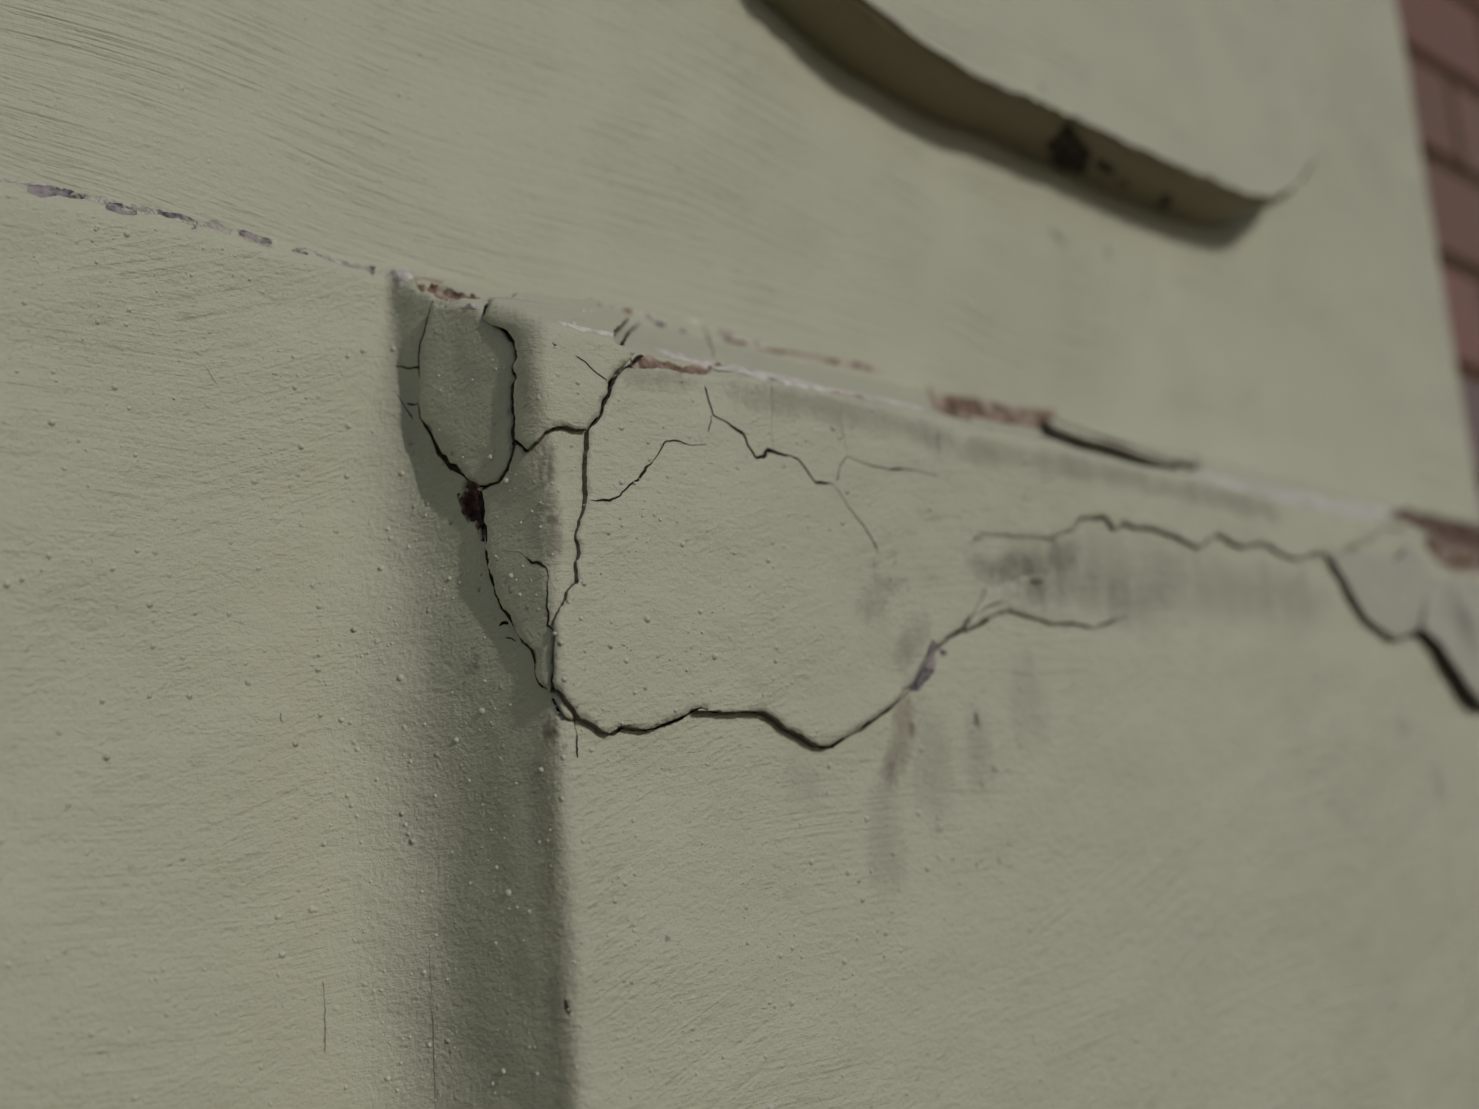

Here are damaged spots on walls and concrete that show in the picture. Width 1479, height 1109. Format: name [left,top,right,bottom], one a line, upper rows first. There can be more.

spalling [0,177,272,248]
spalling [1045,122,1129,188]
crack [396,300,758,758]
crack [592,327,940,581]
peeling [292,247,1479,747]
crack [818,600,1127,749]